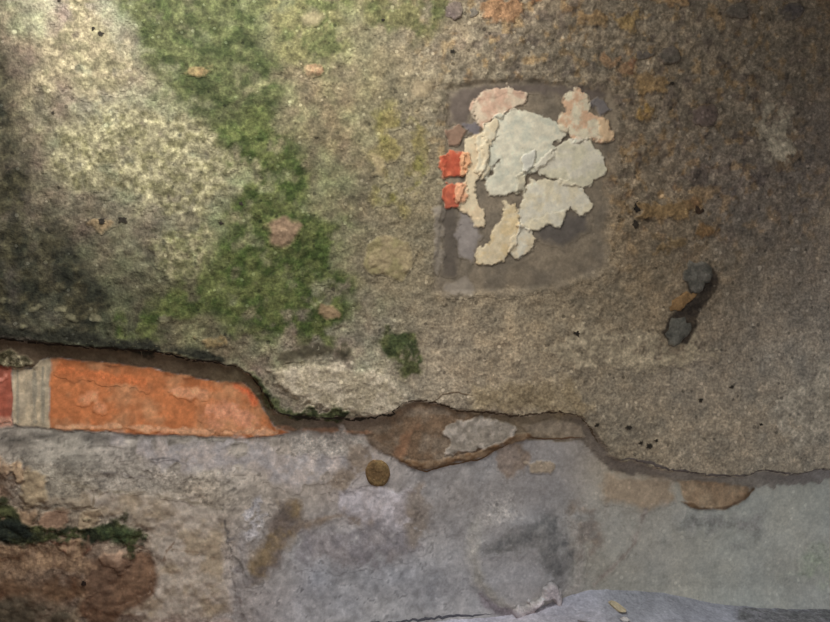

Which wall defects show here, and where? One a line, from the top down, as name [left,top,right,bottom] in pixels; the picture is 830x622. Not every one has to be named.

damp [0,0,244,366]
crack [0,337,598,442]
crack [4,456,251,622]
damp [0,384,435,622]
spalling [274,404,587,481]
crack [617,458,830,477]
crack [376,613,491,622]